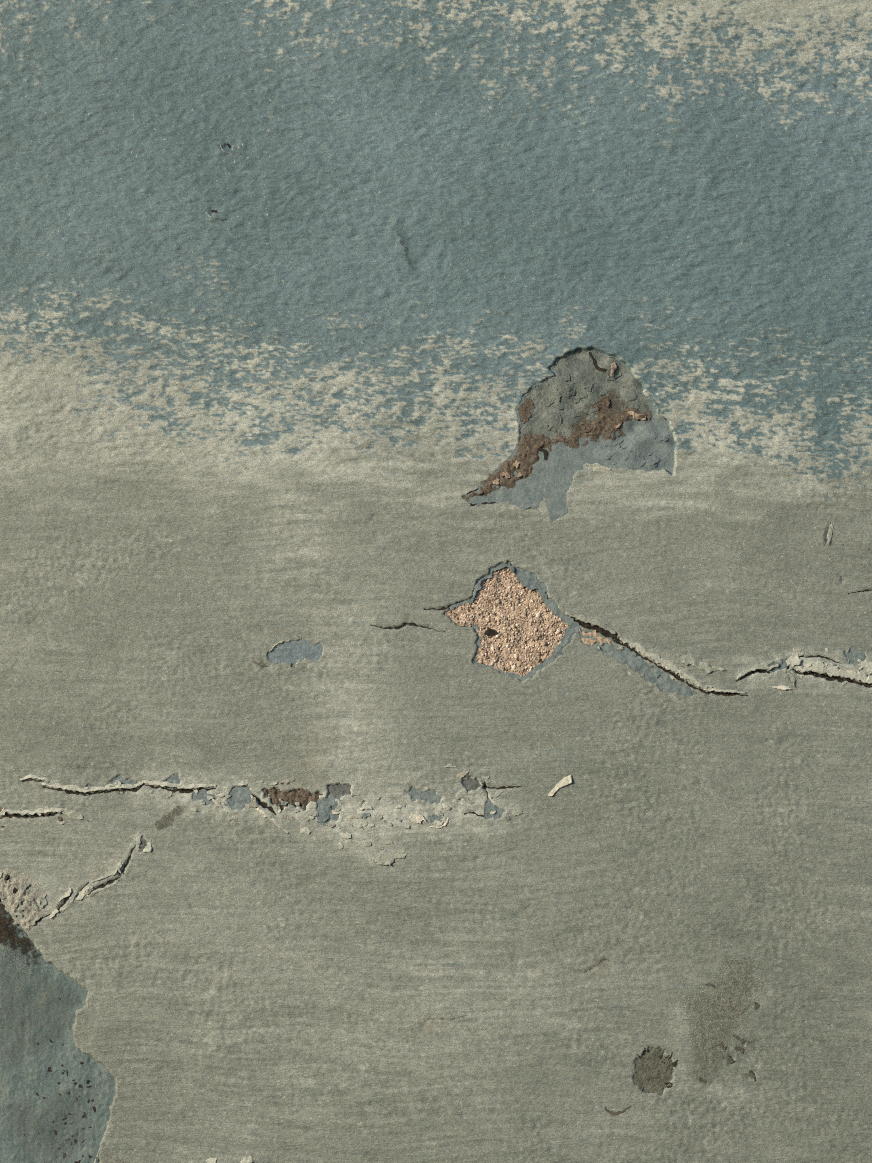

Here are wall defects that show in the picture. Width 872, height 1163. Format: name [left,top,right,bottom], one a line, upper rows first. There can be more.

peeling [461,349,675,522]
spalling [444,561,580,681]
crack [563,612,872,697]
crack [0,764,526,926]
peeling [0,868,116,1163]
hole [633,1046,678,1096]
crack [206,1155,258,1163]